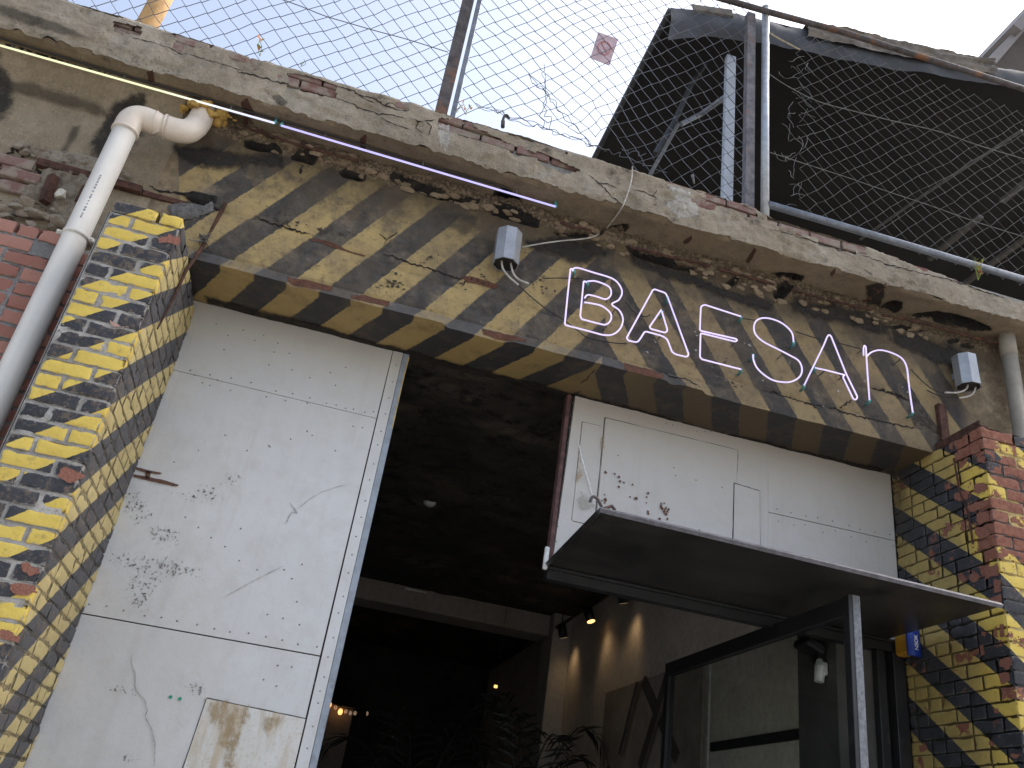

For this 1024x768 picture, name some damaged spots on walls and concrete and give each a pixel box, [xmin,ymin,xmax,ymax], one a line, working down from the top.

crack [336,86,435,135]
spalling [0,149,98,218]
crack [151,186,220,221]
crack [256,216,308,234]
spalling [240,126,540,228]
crack [589,175,657,203]
spalling [554,219,991,349]
crack [761,388,922,430]
corrosion [133,467,179,487]
peeling [954,482,990,539]